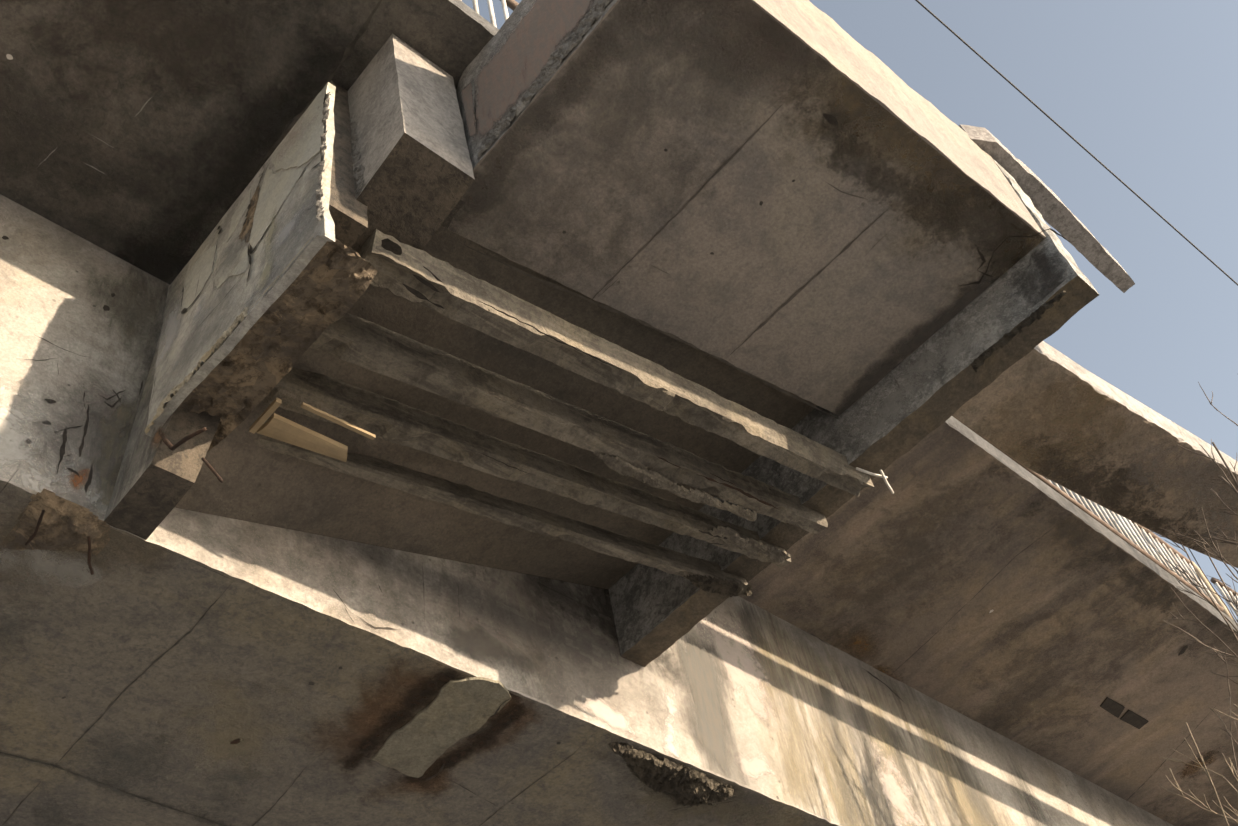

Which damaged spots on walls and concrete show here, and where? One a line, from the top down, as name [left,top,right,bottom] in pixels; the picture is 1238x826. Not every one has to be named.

leakage [450,0,810,232]
crack [180,91,326,331]
spalling [381,238,402,255]
leakage [795,62,1066,416]
spalling [160,427,207,451]
spalling [1,489,111,575]
spalling [593,452,792,565]
rust [331,667,460,770]
rust [390,692,533,795]